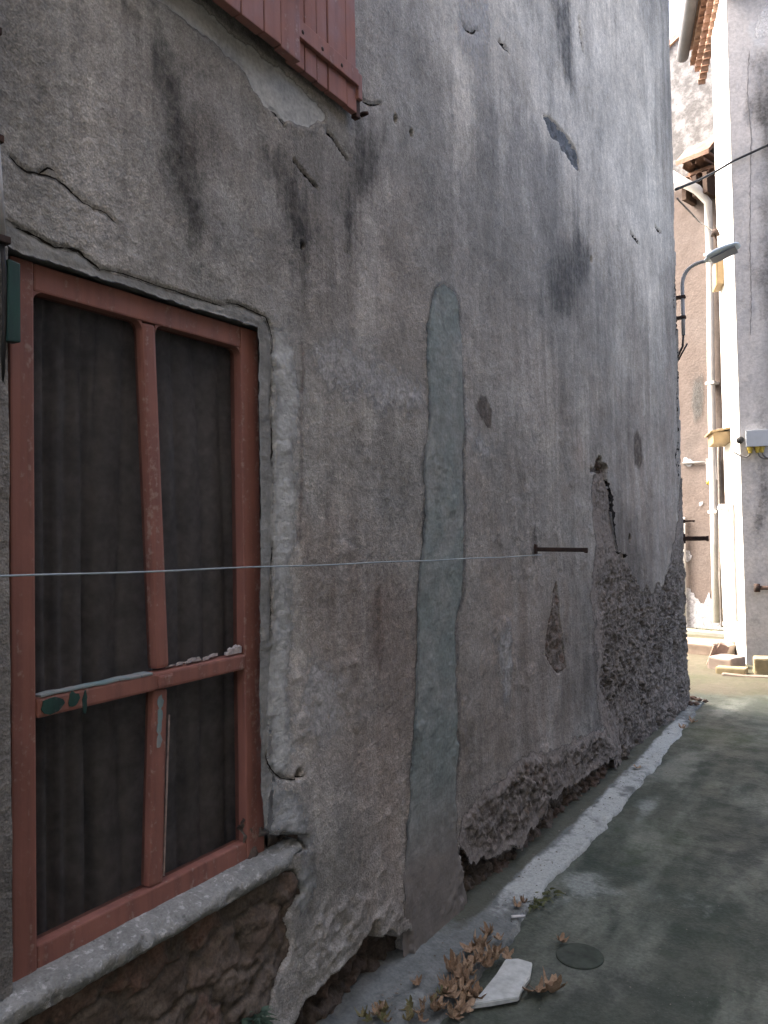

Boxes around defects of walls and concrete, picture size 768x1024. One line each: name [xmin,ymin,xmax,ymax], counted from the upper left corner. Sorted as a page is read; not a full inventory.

flaking render [543,115,579,171]
crack [9,156,114,222]
flaking render [459,457,724,891]